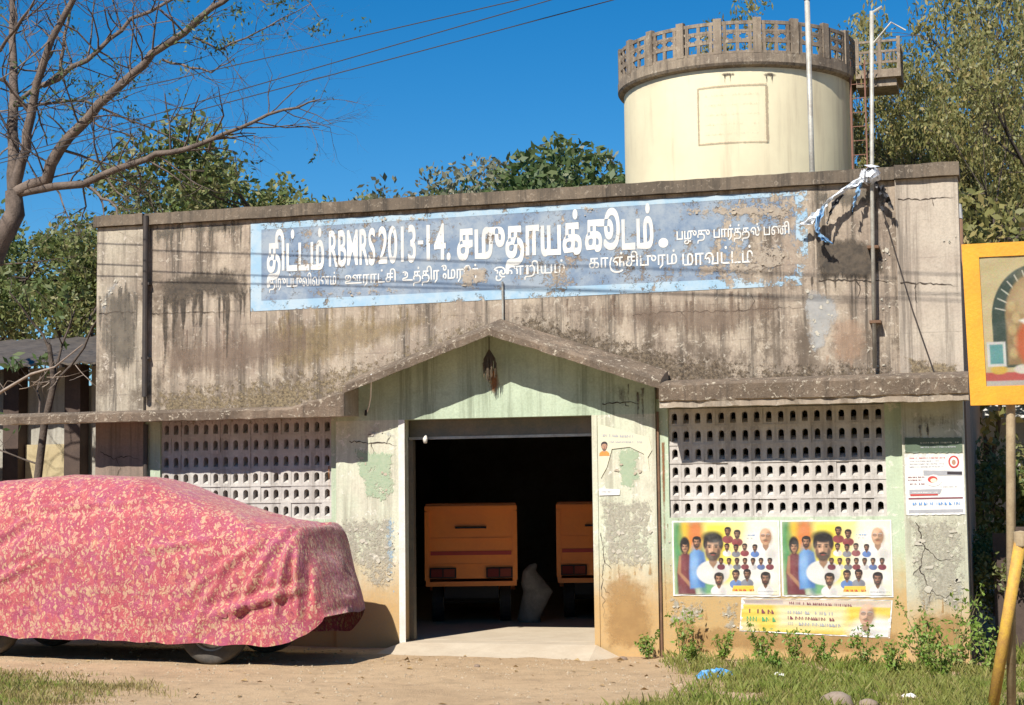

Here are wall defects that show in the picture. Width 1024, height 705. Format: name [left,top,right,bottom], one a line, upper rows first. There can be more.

peeling [679,203,789,220]
peeling [706,244,789,275]
water stain [811,239,883,299]
water stain [163,268,306,374]
peeling [355,449,394,501]
peeling [614,447,642,487]
peeling [341,517,399,592]
peeling [600,498,652,571]
crack [913,522,954,604]